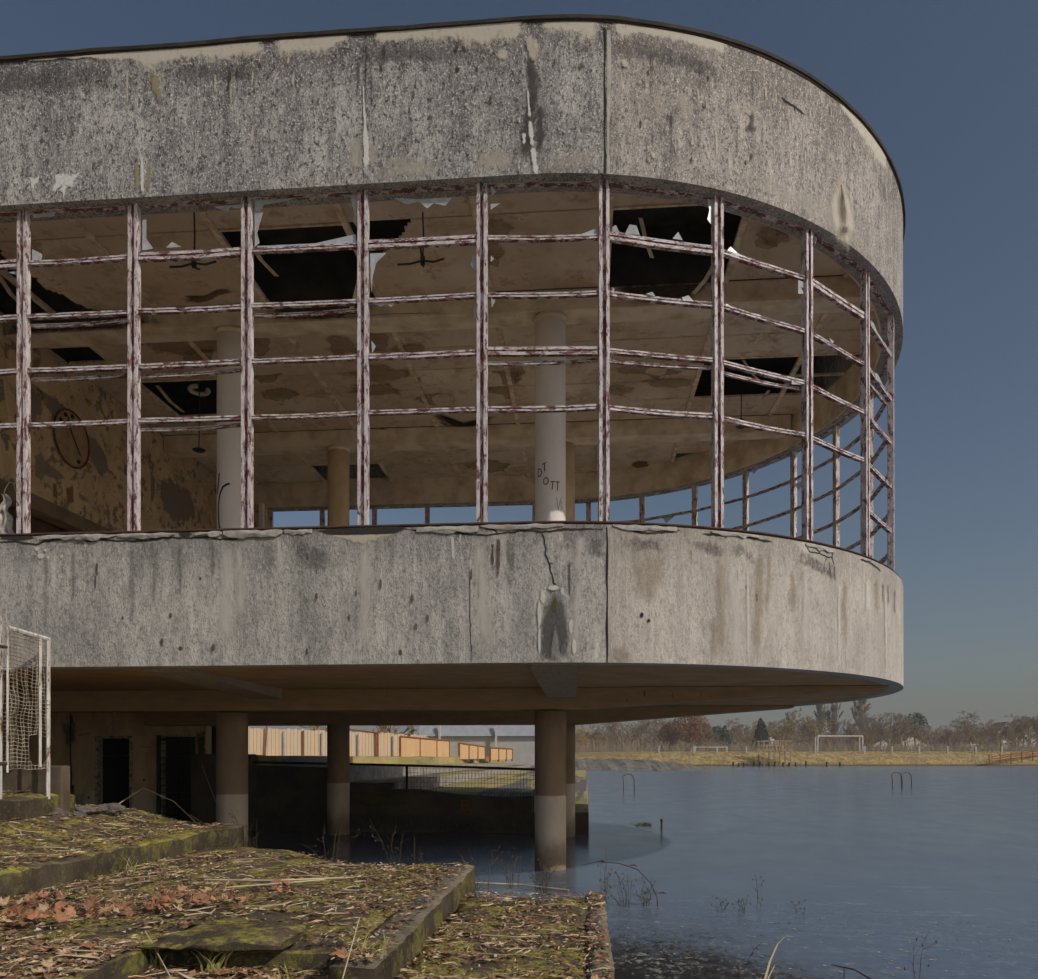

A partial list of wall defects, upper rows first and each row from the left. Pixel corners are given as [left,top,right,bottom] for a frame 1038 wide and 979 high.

water stain [352,64,376,176]
water stain [519,56,544,173]
peeling [31,384,65,422]
peeling [35,451,65,484]
peeling [141,473,197,526]
crack [454,528,602,585]
crack [633,530,771,542]
water stain [470,539,501,634]
water stain [537,540,582,659]